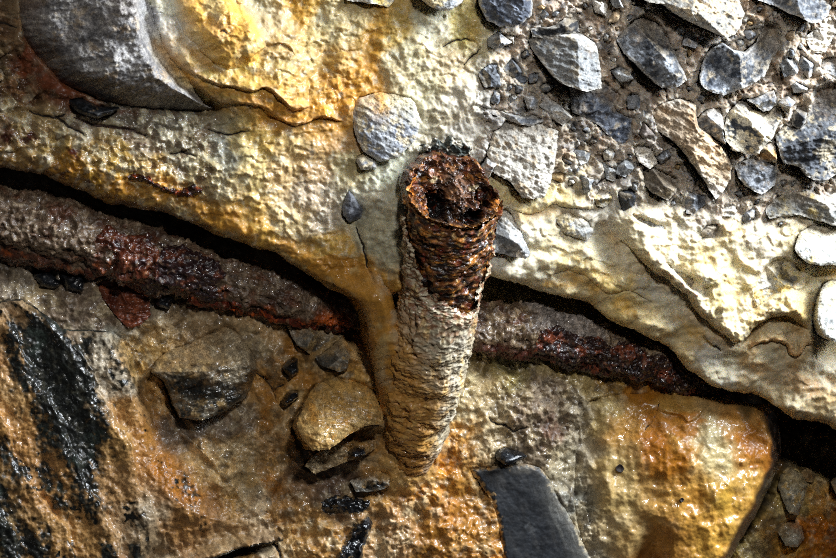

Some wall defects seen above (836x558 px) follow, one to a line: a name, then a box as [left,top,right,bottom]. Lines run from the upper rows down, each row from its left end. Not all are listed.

spalling [487,32,514,49]
spalling [479,50,539,104]
spalling [583,0,636,31]
spalling [779,24,814,93]
corrosion [123,173,203,198]
spalling [552,124,597,194]
spalling [603,146,672,211]
spalling [671,192,706,214]
spalling [723,191,759,224]
corrosion [0,185,360,334]
spalling [383,136,503,478]
corrosion [471,298,730,398]